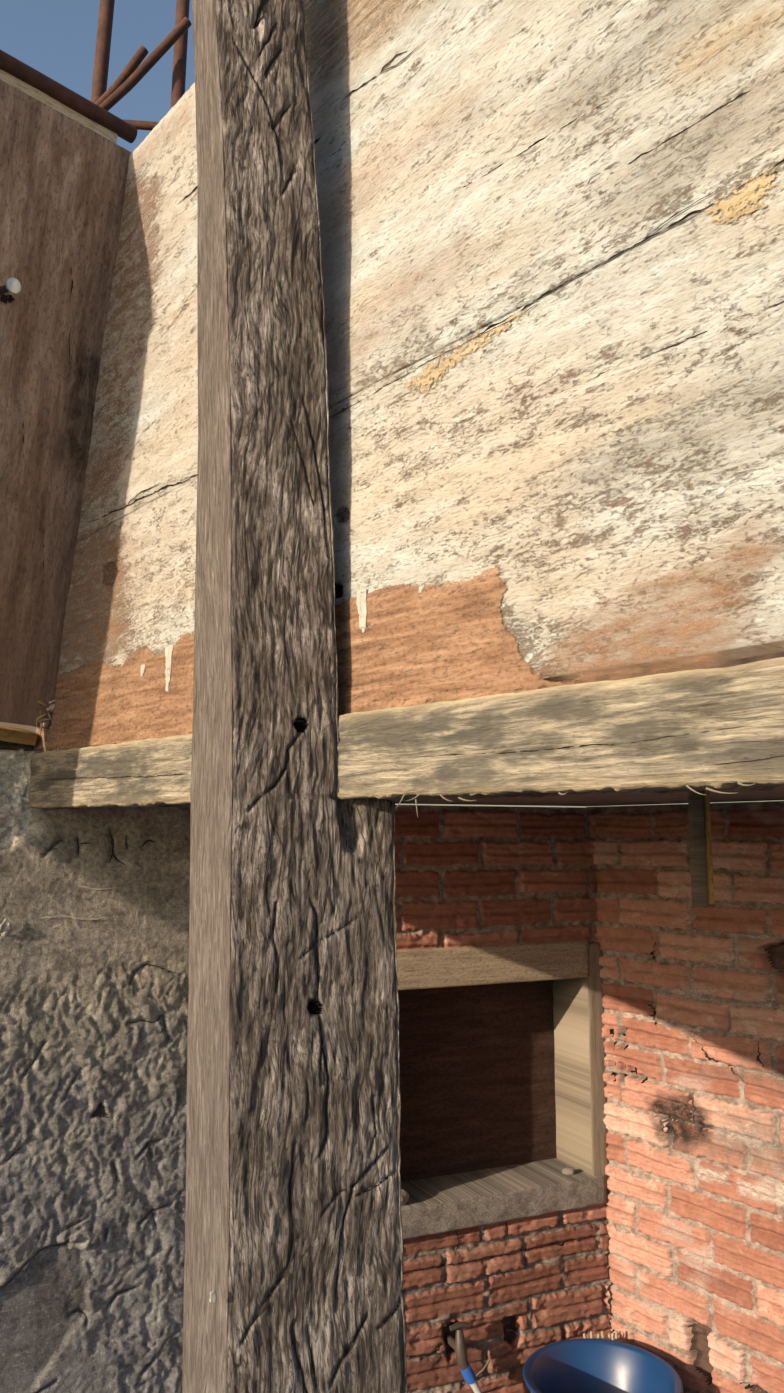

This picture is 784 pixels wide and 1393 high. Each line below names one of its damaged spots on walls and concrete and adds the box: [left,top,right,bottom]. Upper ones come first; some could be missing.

crack [291,159,784,548]
peeling [335,546,771,715]
peeling [0,632,194,837]
crack [113,1139,160,1182]
crack [3,1204,169,1324]